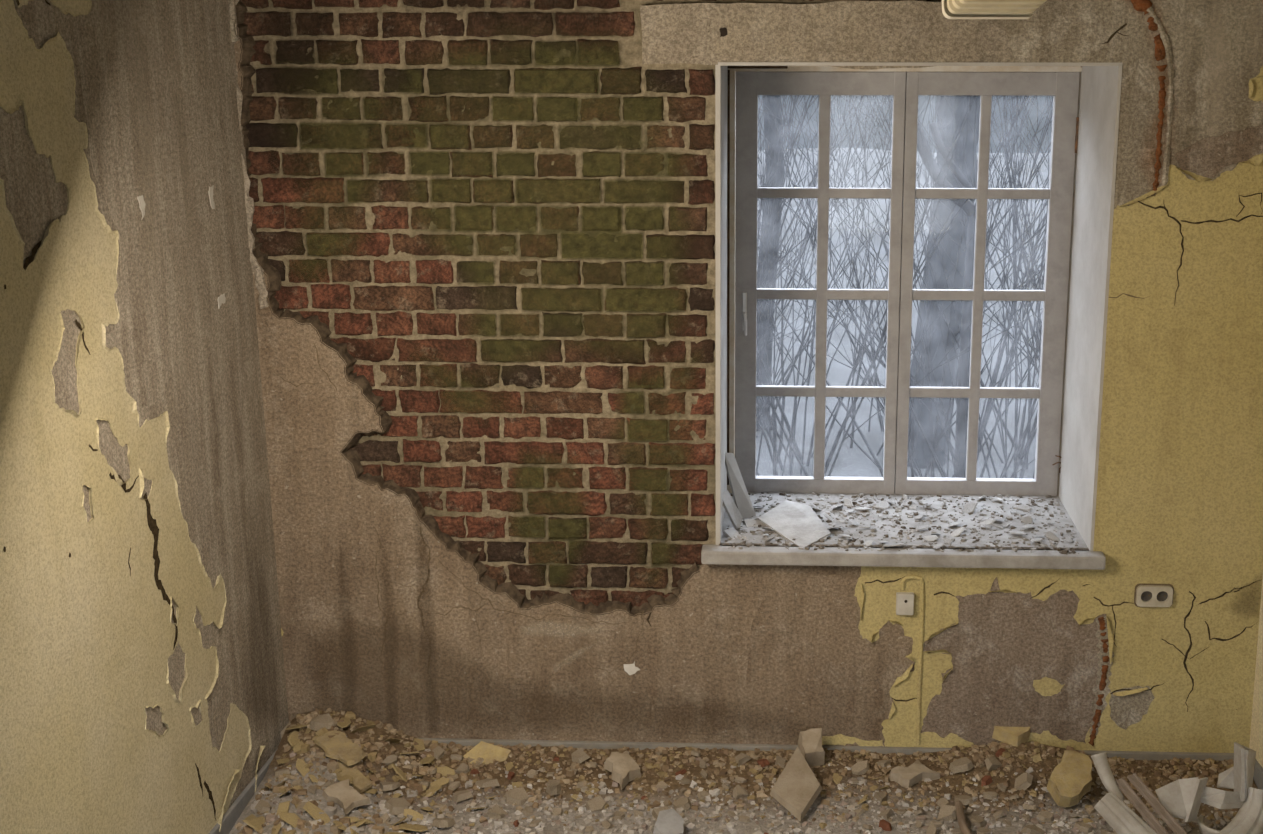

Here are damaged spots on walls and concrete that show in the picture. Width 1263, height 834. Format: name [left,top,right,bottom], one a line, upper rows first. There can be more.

peeling [0,100,70,266]
crack [1102,23,1128,44]
peeling [985,0,1263,209]
crack [1109,193,1263,306]
spalling [12,0,942,832]
crack [89,444,178,650]
peeling [746,574,1155,746]
crack [1110,580,1259,712]